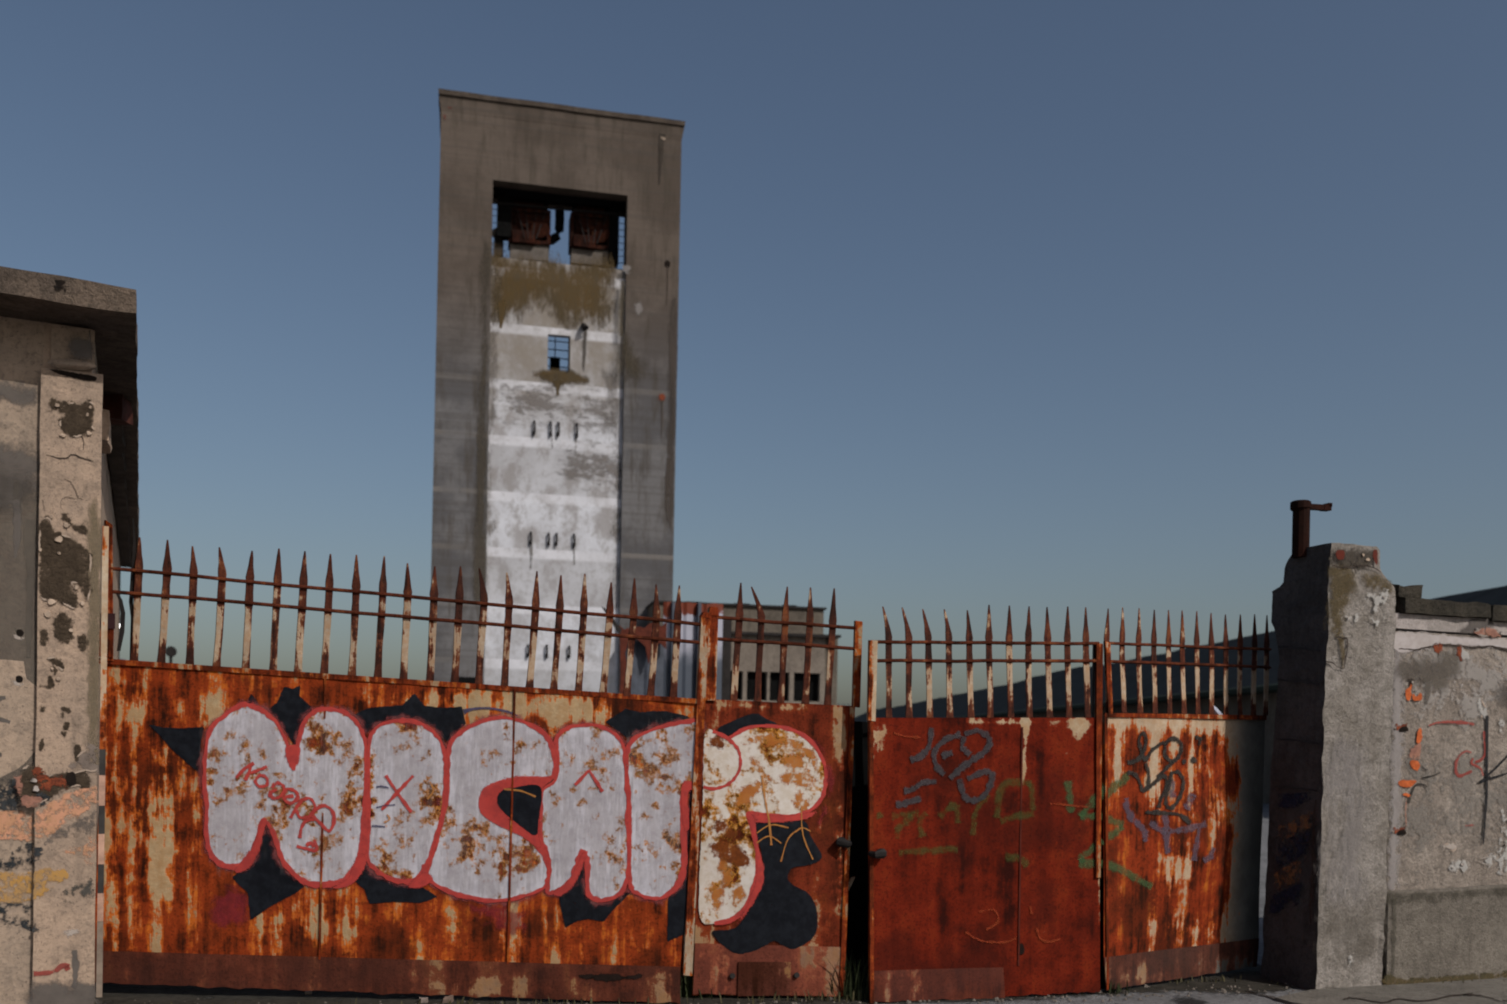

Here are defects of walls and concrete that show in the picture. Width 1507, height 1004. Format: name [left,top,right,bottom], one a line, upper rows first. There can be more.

water stain [0,381,37,407]
spalling [48,398,95,438]
water stain [473,243,640,601]
water stain [0,443,40,686]
spalling [13,513,93,689]
water stain [0,752,35,786]
spalling [14,707,99,808]
spalling [1398,727,1423,826]
spalling [1405,681,1422,701]
water stain [1386,618,1507,965]
peeling [1475,694,1505,736]
peeling [1442,809,1507,875]